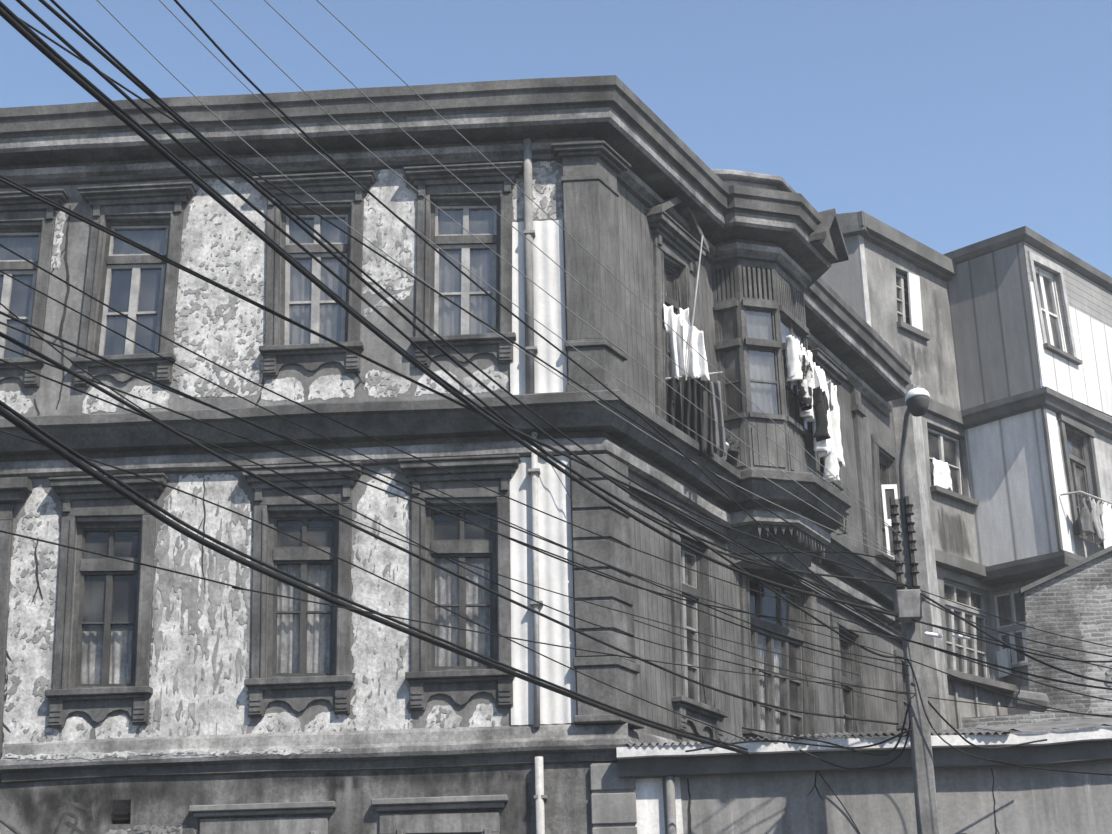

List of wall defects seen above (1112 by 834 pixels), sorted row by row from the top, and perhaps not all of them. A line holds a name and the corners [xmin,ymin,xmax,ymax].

peeling [513,161,564,220]
crack [34,205,71,416]
peeling [82,169,509,414]
peeling [0,391,33,416]
crack [8,537,43,618]
crack [198,478,206,594]
peeling [3,468,503,760]
spalling [134,822,196,834]